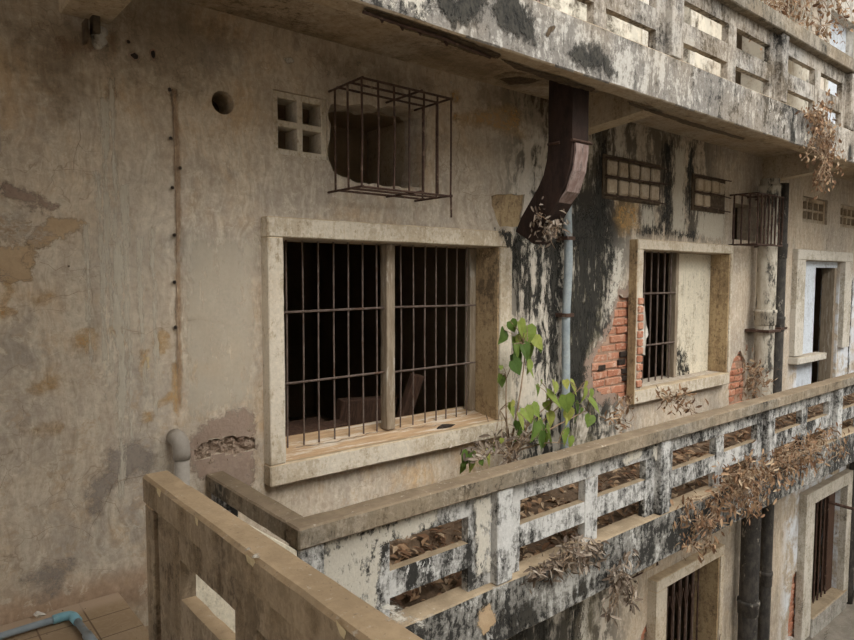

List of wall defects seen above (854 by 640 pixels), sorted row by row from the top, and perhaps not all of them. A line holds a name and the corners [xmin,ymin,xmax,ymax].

leakage [383,0,540,49]
leakage [567,38,618,78]
peeling [0,182,86,284]
leakage [494,137,725,431]
flaking render [582,282,644,417]
peeling [189,407,257,487]
leakage [623,445,657,466]
leakage [323,510,438,608]
leakage [474,496,493,576]
leakage [498,597,553,640]
leakage [566,577,603,640]